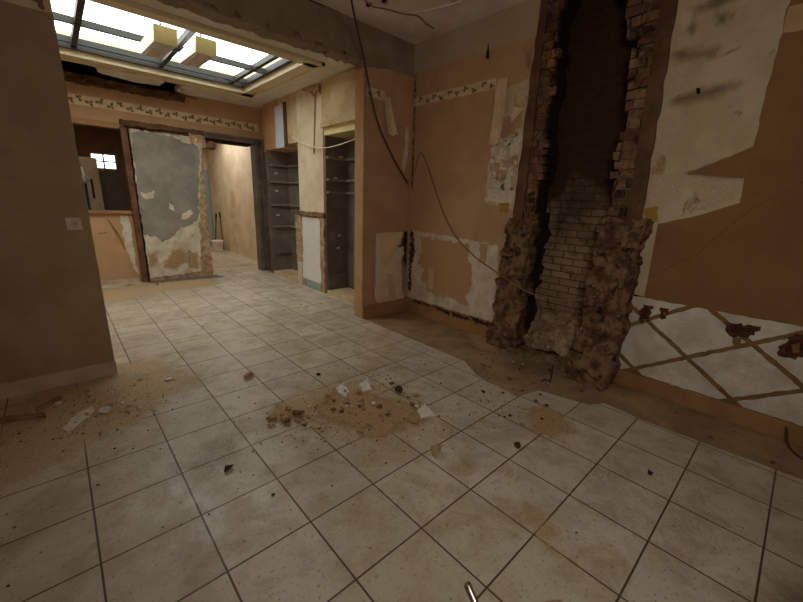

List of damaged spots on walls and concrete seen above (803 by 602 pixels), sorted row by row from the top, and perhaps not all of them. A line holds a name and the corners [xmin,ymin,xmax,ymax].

peeling [179,135,217,150]
flaking render [375,76,552,359]
flaking render [562,0,803,427]